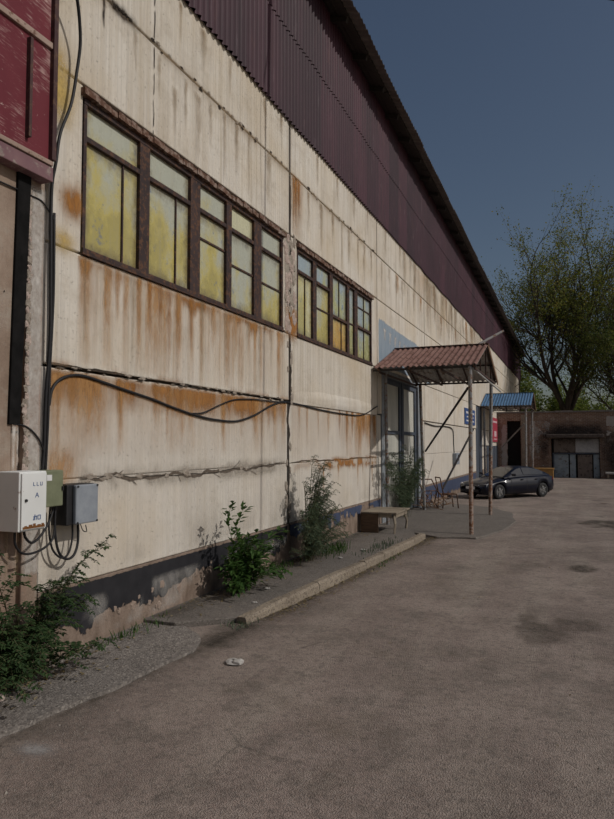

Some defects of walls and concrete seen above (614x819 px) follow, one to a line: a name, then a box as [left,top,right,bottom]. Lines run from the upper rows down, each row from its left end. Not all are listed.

water stain [103,0,133,24]
rust [64,190,81,217]
rust [80,258,91,292]
rust [105,270,215,341]
rust [51,371,102,421]
rust [116,380,139,414]
rust [152,385,284,424]
crack [80,336,372,530]
rust [339,411,376,436]
rust [323,457,371,476]
peeling [323,499,381,532]
peeling [41,522,305,634]